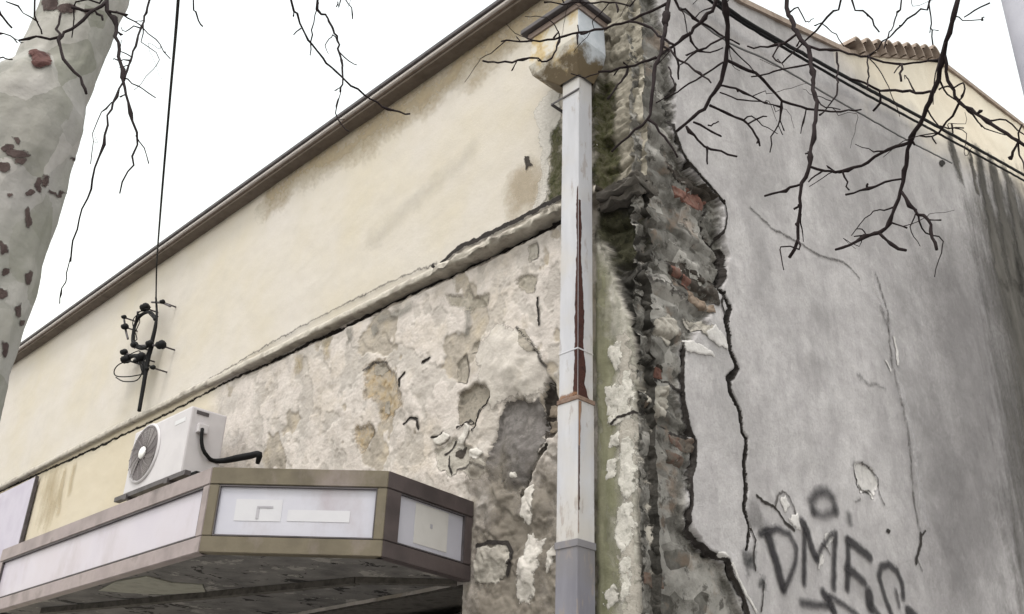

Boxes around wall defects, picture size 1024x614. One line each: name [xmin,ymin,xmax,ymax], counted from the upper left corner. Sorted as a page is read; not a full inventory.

spalling [356,361,402,453]
spalling [433,289,559,604]
spalling [517,275,537,293]
corrosion [559,187,589,533]
spalling [602,19,732,614]
crack [662,82,851,614]
spalling [853,462,885,505]
crack [859,277,912,467]
crack [913,492,926,571]
damp [948,135,1024,575]